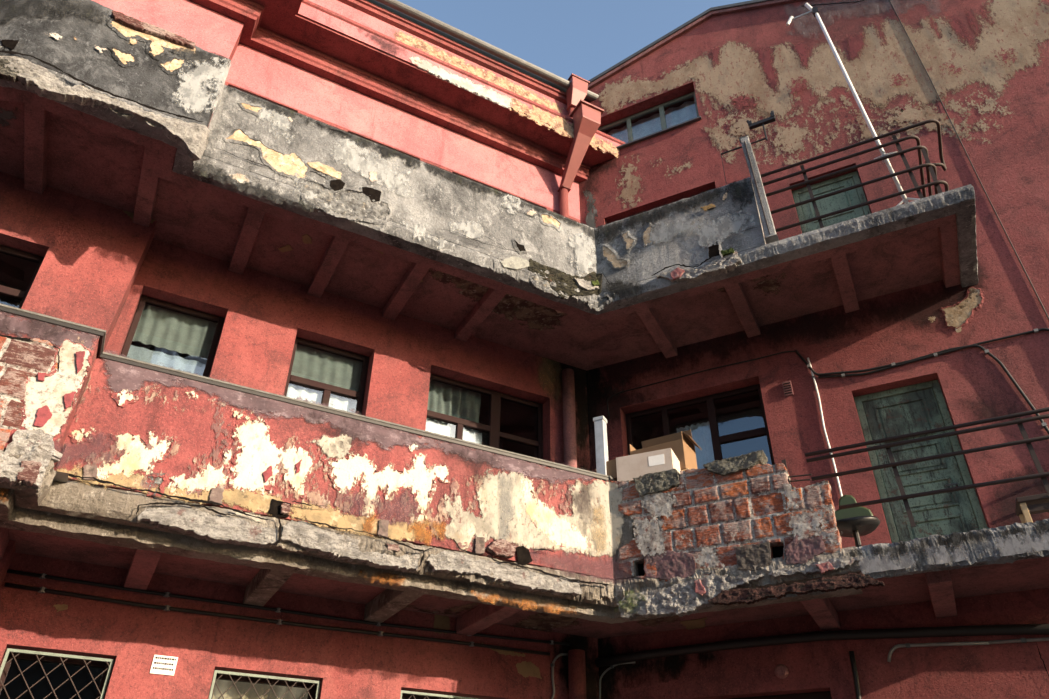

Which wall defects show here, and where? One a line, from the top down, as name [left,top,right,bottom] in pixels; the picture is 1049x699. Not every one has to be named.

leakage [0,0,110,24]
spalling [0,36,210,161]
flaking render [95,10,199,75]
spalling [367,31,574,138]
peeling [598,0,1049,158]
spalling [223,128,397,225]
leakage [0,311,99,351]
leakage [101,262,987,484]
leakage [54,433,112,466]
crack [68,473,613,586]
peeling [0,336,885,634]
leakage [847,470,1049,574]